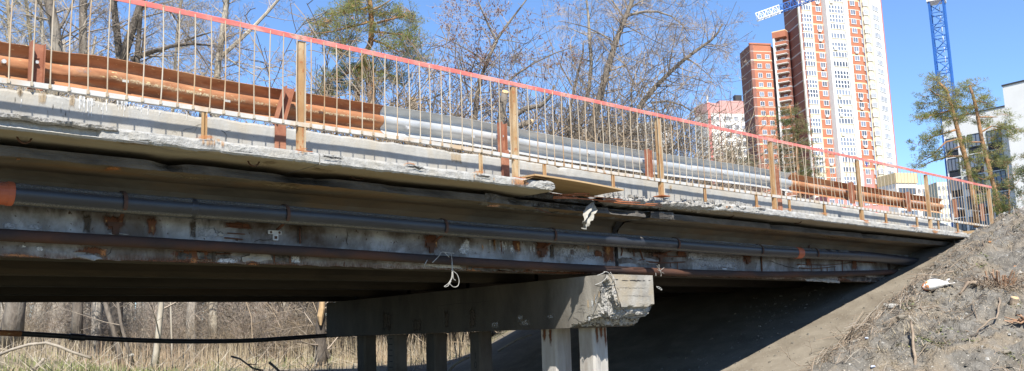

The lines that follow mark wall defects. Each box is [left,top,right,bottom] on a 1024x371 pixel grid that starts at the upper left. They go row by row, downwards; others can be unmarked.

spalling [227,144,255,152]
spalling [534,180,556,190]
spalling [593,192,766,215]
corrosion [482,239,554,258]